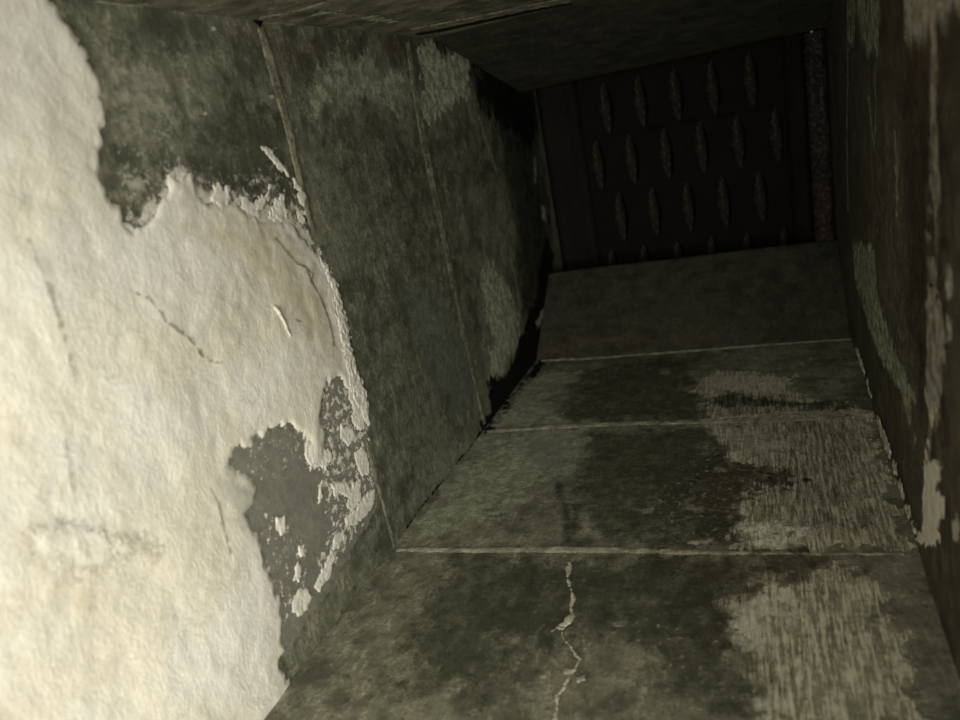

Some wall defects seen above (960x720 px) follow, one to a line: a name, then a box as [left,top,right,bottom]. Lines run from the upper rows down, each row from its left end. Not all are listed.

flaking render [122,146,309,237]
damp [310,38,471,126]
damp [904,0,959,204]
damp [379,86,959,720]
flaking render [229,378,377,654]
crack [551,561,586,720]